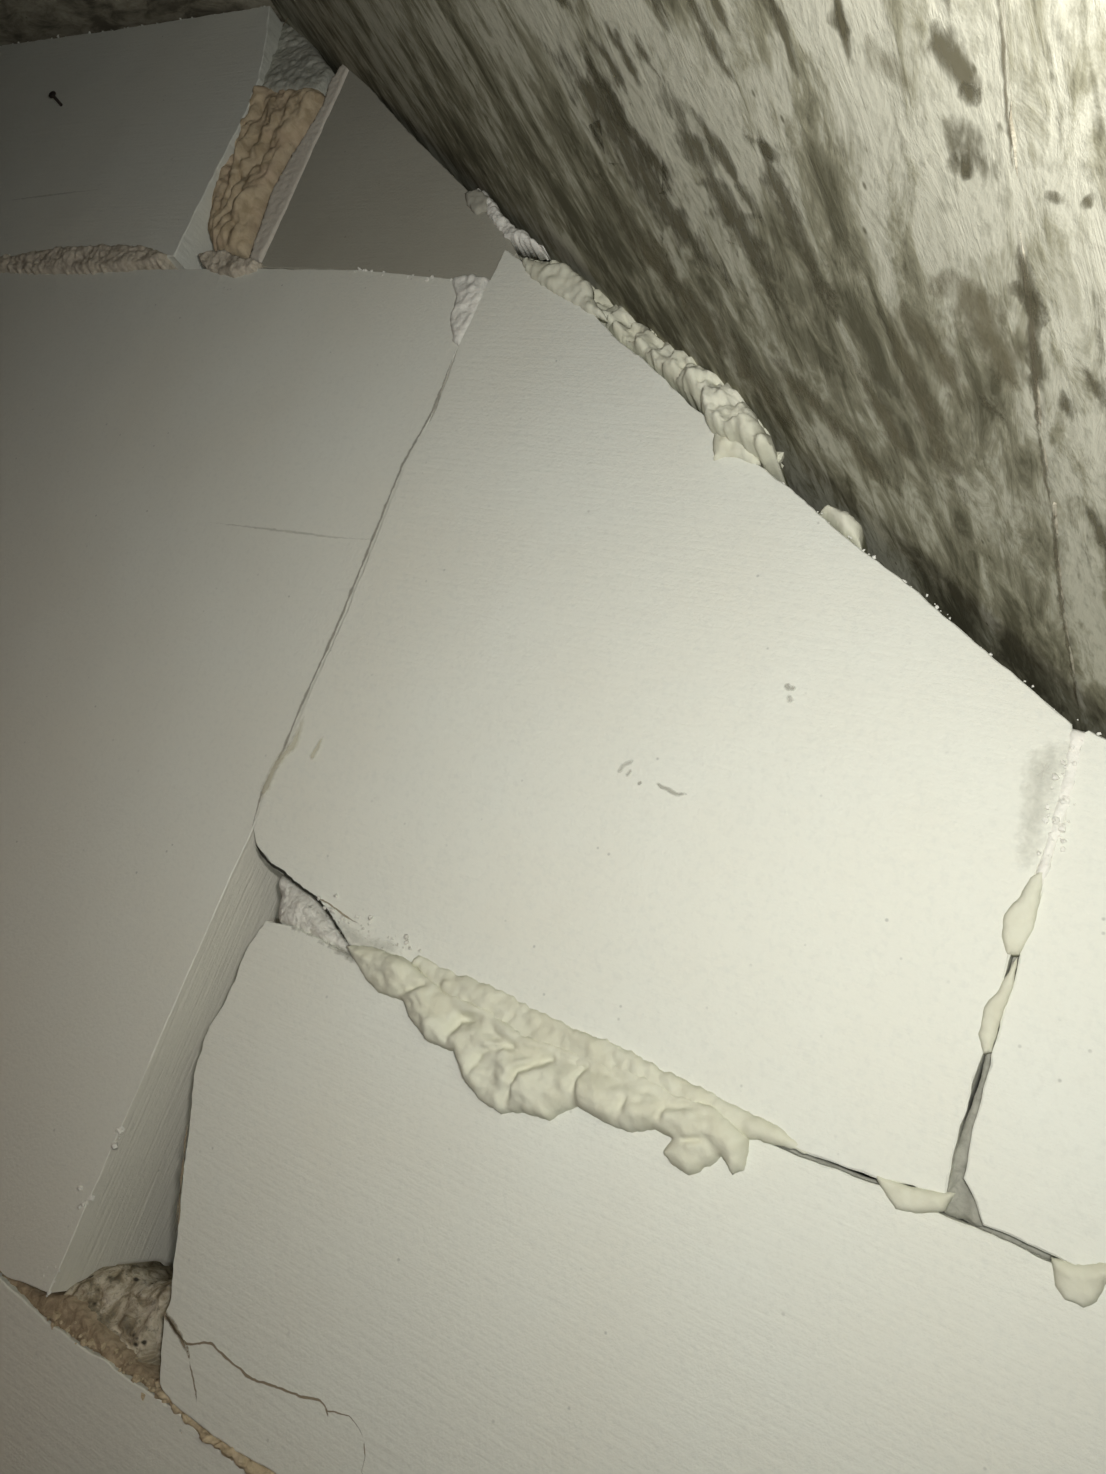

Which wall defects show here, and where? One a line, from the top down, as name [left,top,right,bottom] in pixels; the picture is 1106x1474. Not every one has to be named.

water stain [688,0,731,76]
water stain [768,0,797,71]
water stain [833,0,850,56]
water stain [930,27,977,102]
water stain [947,126,986,179]
water stain [562,27,775,401]
water stain [758,141,839,320]
water stain [959,259,1043,386]
water stain [1089,511,1106,550]
crack [257,374,447,808]
crack [255,844,355,943]
crack [163,1312,365,1460]